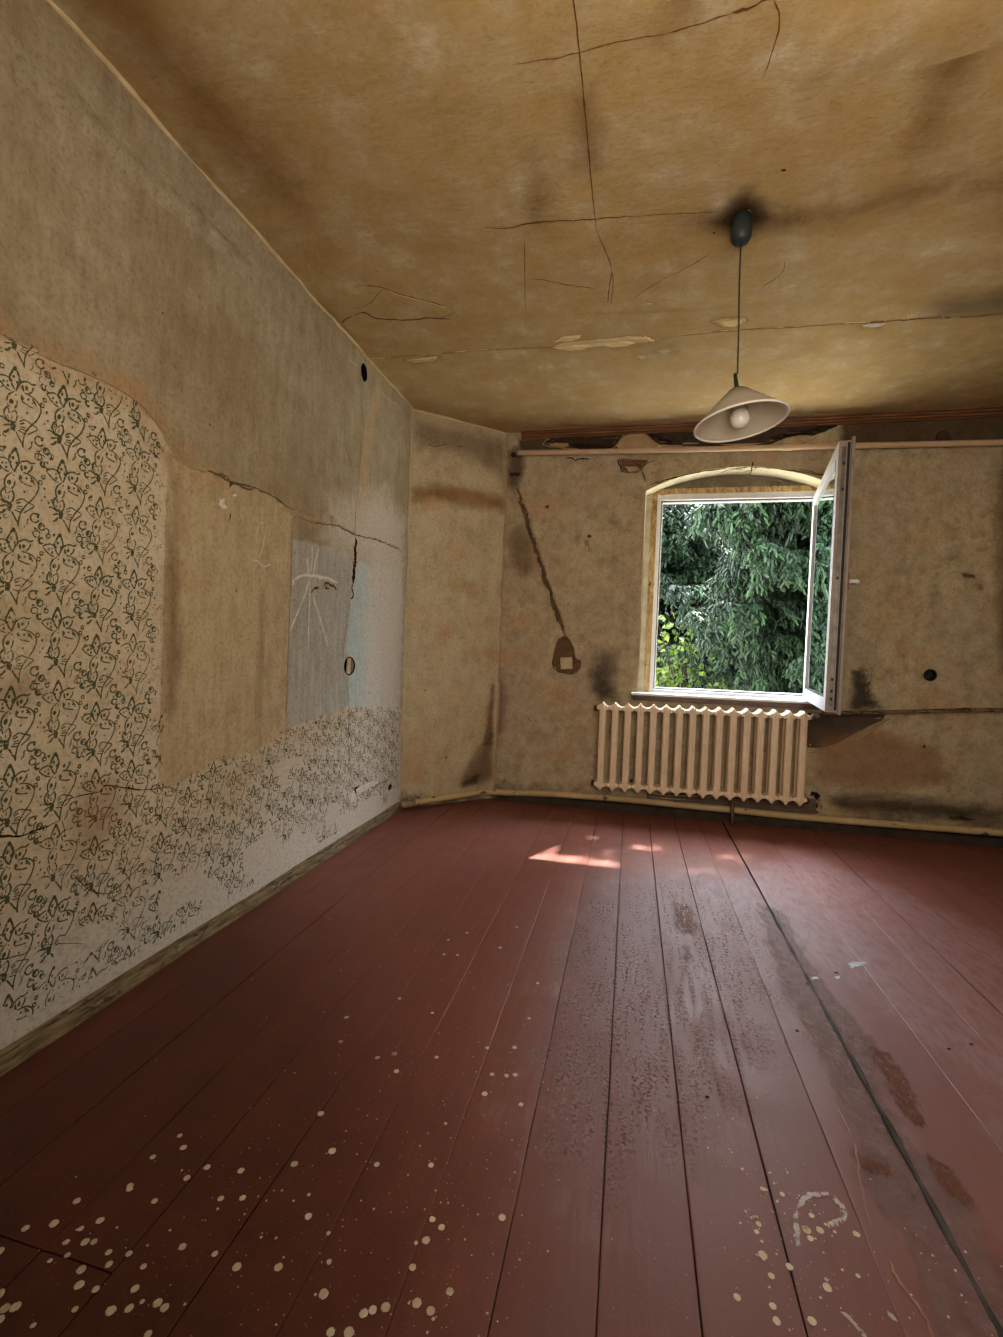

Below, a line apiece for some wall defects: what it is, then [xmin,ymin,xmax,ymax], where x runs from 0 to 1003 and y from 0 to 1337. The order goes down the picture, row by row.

peeling [0,333,401,559]
crack [341,0,780,783]
crack [655,296,1003,340]
flaking render [349,779,392,803]